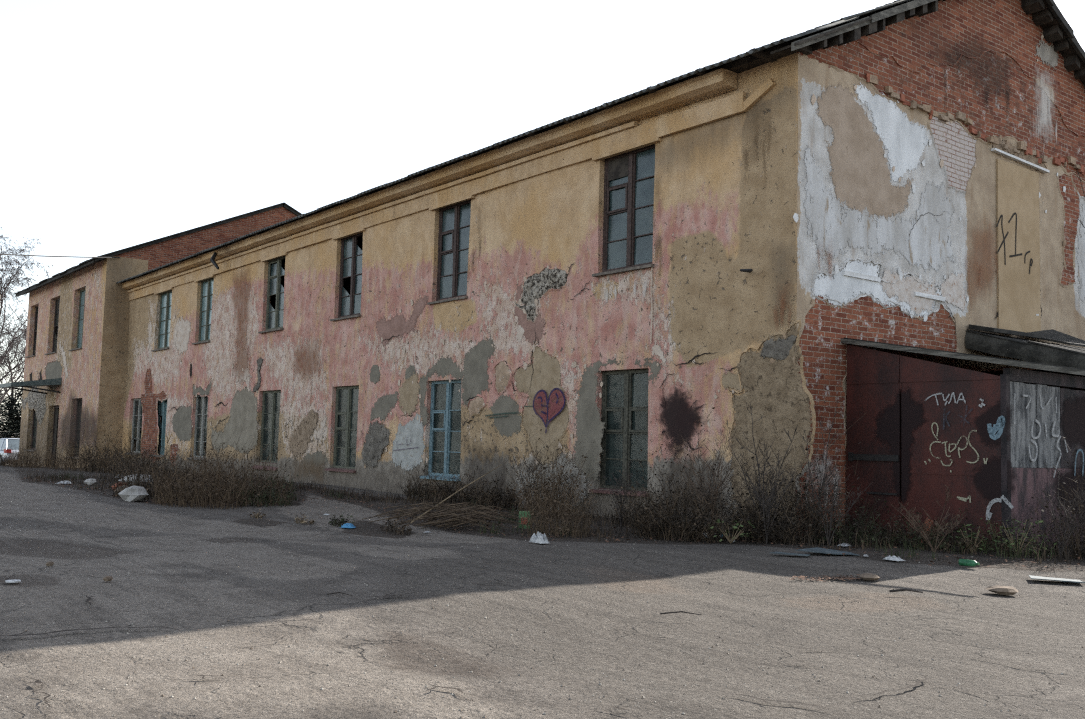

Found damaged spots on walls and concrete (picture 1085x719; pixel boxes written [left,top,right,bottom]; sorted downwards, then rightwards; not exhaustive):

flaking render [1035,35,1059,68]
spalling [714,40,1085,535]
flaking render [210,348,264,459]
flaking render [288,408,328,466]
spalling [361,265,667,510]